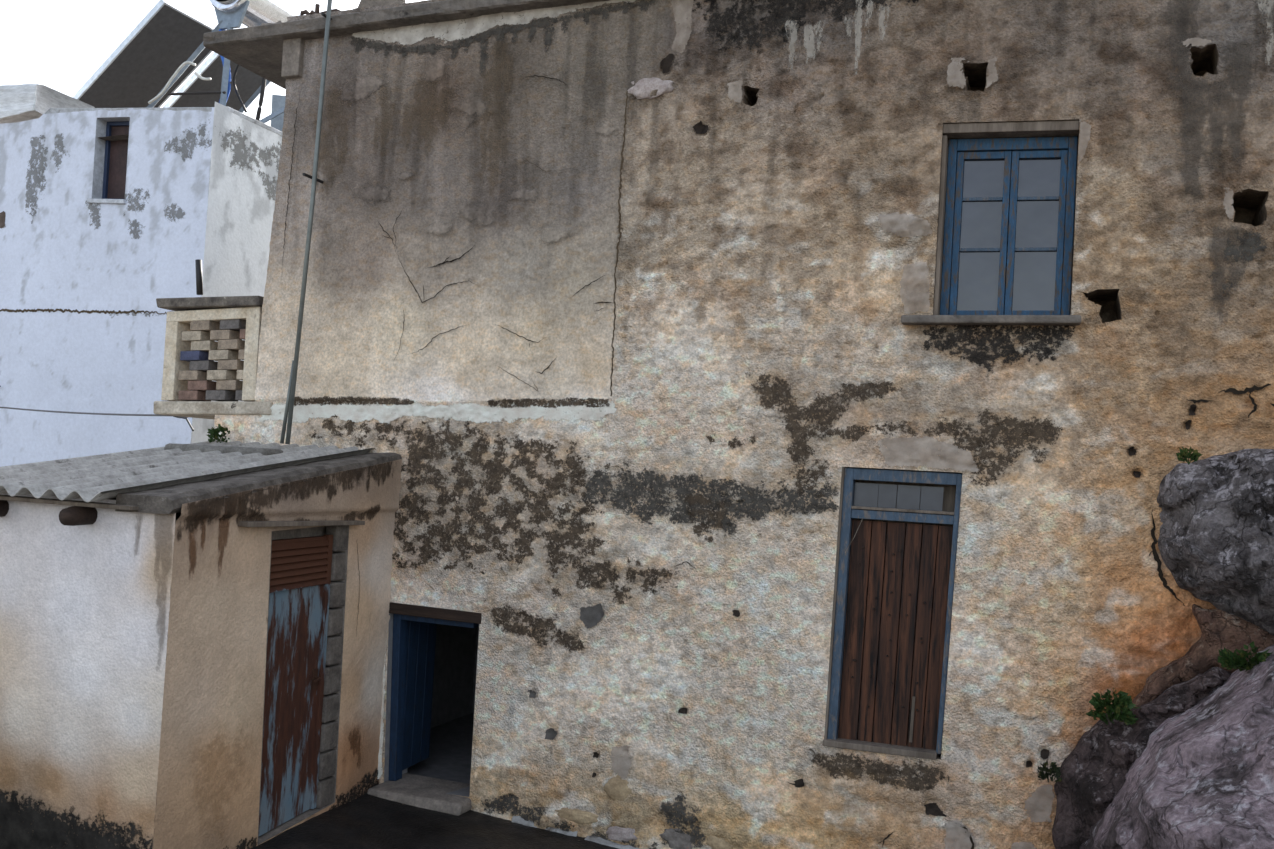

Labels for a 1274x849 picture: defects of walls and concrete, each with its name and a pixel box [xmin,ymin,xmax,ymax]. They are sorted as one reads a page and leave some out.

leakage [351,0,656,74]
peeling [25,133,66,224]
peeling [124,188,149,239]
peeling [164,204,185,221]
peeling [164,124,282,201]
crack [0,307,172,315]
crack [379,209,475,356]
crack [495,324,557,391]
leakage [921,325,1076,377]
leakage [177,373,1064,605]
crack [1149,509,1185,606]
leakage [484,598,584,653]